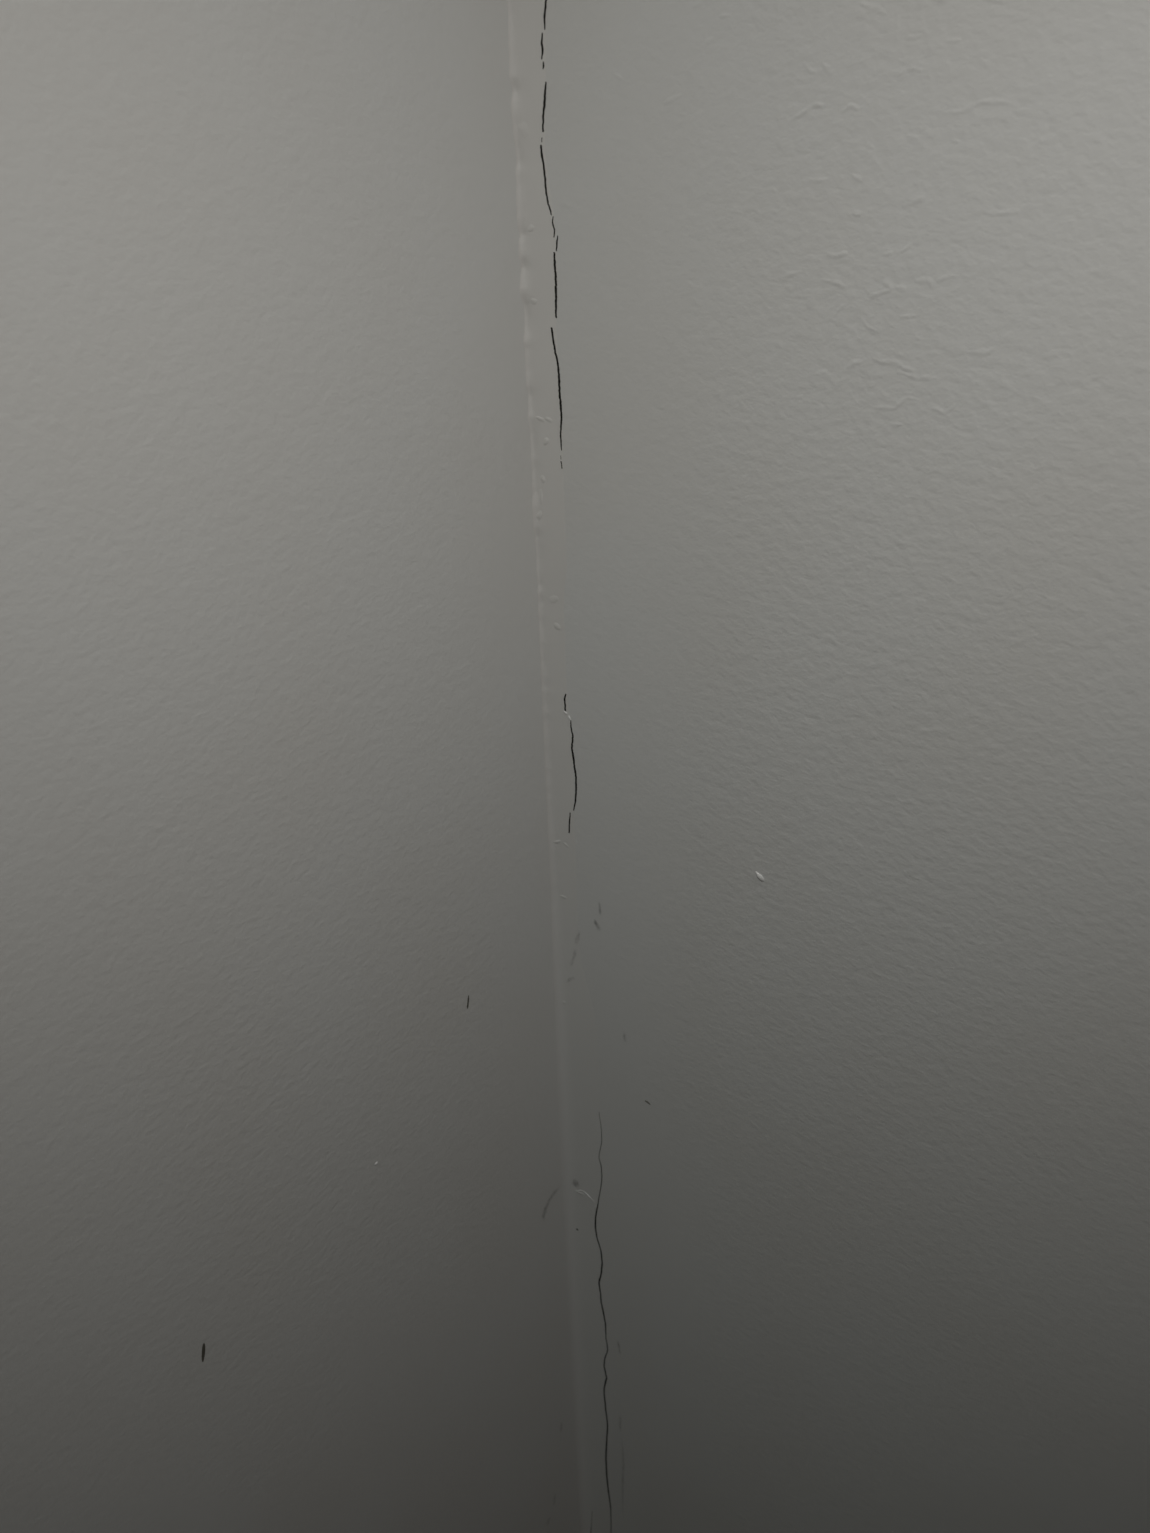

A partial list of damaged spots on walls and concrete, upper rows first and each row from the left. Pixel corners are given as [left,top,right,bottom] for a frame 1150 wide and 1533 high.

crack [540,0,563,469]
crack [563,694,577,833]
crack [591,1116,612,1533]